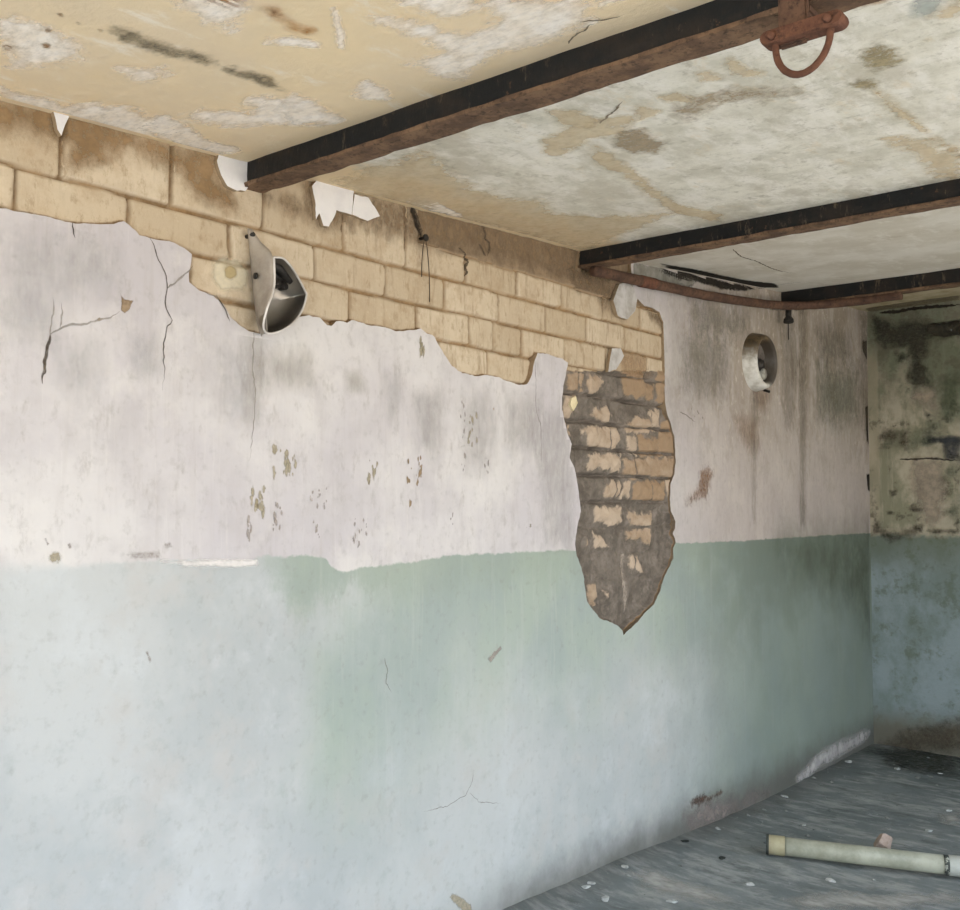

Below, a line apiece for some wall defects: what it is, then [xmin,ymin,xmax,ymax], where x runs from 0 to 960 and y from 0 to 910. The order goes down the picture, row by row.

peeling [0,19,79,69]
water stain [120,32,209,63]
peeling [186,0,246,33]
peeling [376,0,597,77]
crack [568,16,620,44]
water stain [228,69,275,87]
water stain [662,264,778,288]
crack [151,240,192,390]
crack [41,300,116,384]
flaking render [0,86,674,631]
water stain [867,296,960,385]
water stain [928,436,960,459]